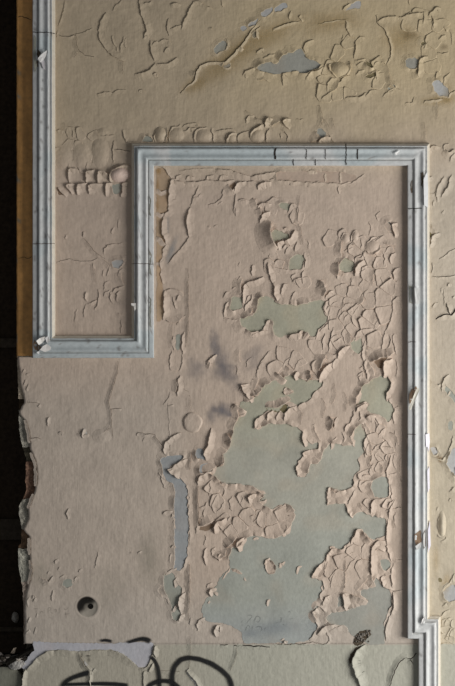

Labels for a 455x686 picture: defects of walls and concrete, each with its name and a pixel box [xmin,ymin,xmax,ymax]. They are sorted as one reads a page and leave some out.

peeling [238,0,402,103]
peeling [378,0,455,107]
crack [57,238,111,283]
crack [431,249,455,281]
crack [436,302,455,322]
peeling [148,166,420,686]
peeling [425,418,455,493]
peeling [17,336,159,686]
peeling [436,574,455,647]